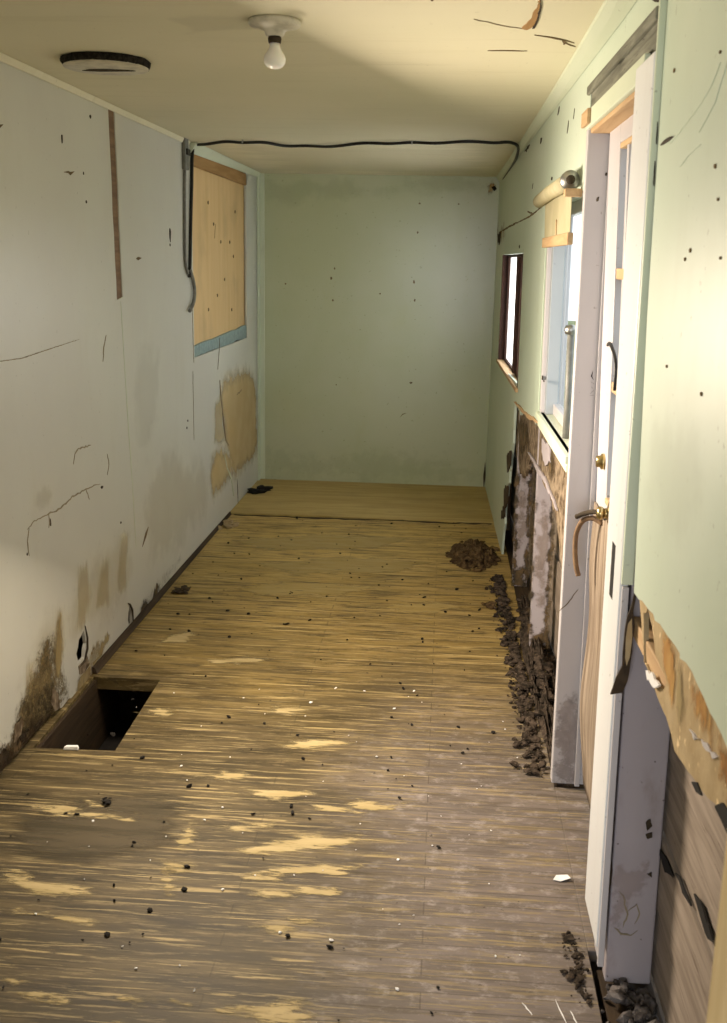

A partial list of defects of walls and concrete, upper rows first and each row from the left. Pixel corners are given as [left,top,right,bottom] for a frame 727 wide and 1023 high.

crack [488,35,576,52]
crack [0,339,79,362]
crack [27,308,149,556]
peeling [211,372,257,496]
peeling [501,485,509,519]
leakage [0,615,109,754]
peeling [645,670,661,688]
peeling [607,817,640,936]